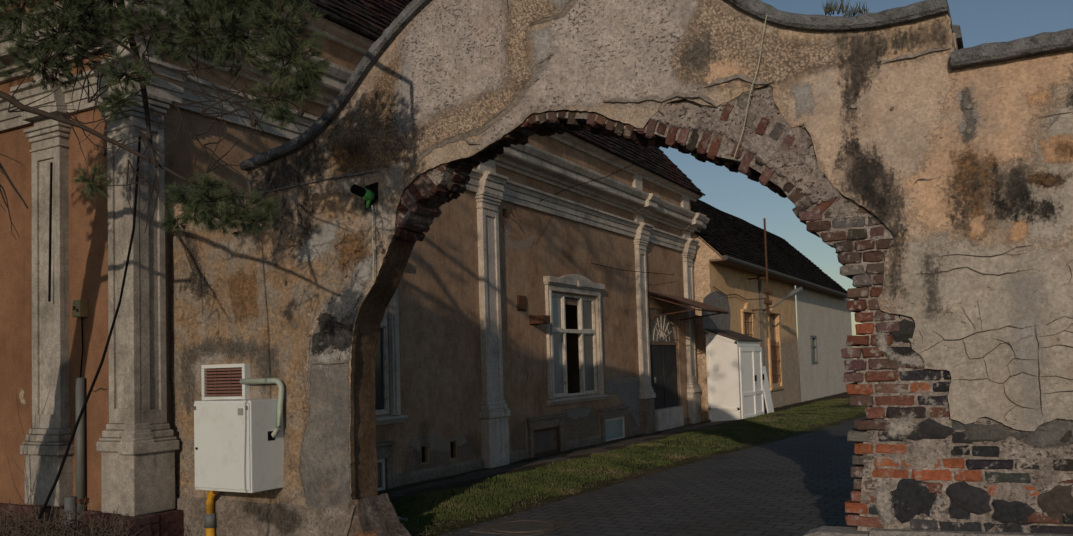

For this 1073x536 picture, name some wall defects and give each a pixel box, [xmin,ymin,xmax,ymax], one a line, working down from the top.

crack [604,73,775,115]
leakage [834,19,949,297]
leakage [991,158,1054,221]
peeling [169,0,1073,507]
crack [917,245,1033,276]
crack [922,300,1073,421]